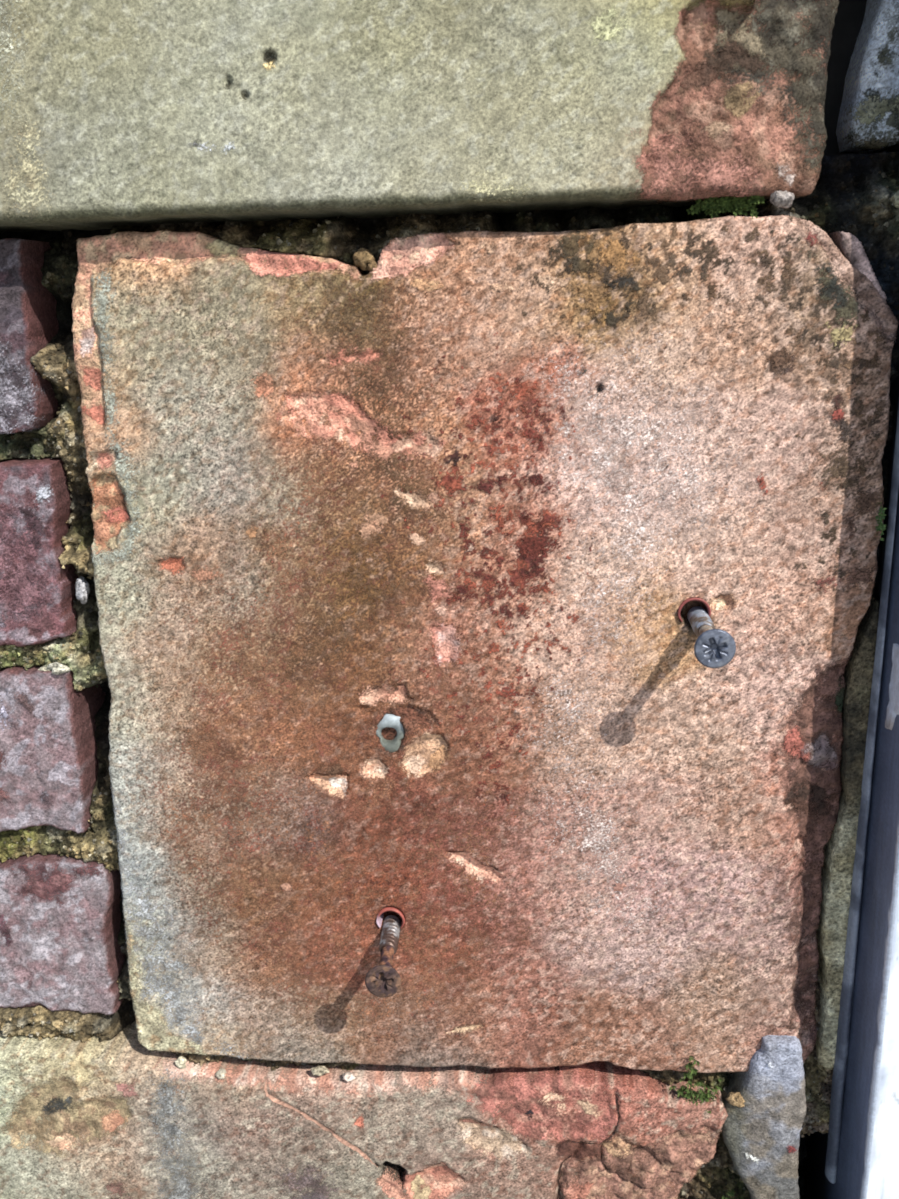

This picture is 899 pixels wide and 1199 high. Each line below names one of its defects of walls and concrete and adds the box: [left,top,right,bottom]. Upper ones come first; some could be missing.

spalling [635,0,839,203]
damp [517,216,895,479]
damp [795,509,878,592]
corrosion [136,273,547,1061]
crack [264,1066,379,1167]
spalling [156,1053,722,1199]